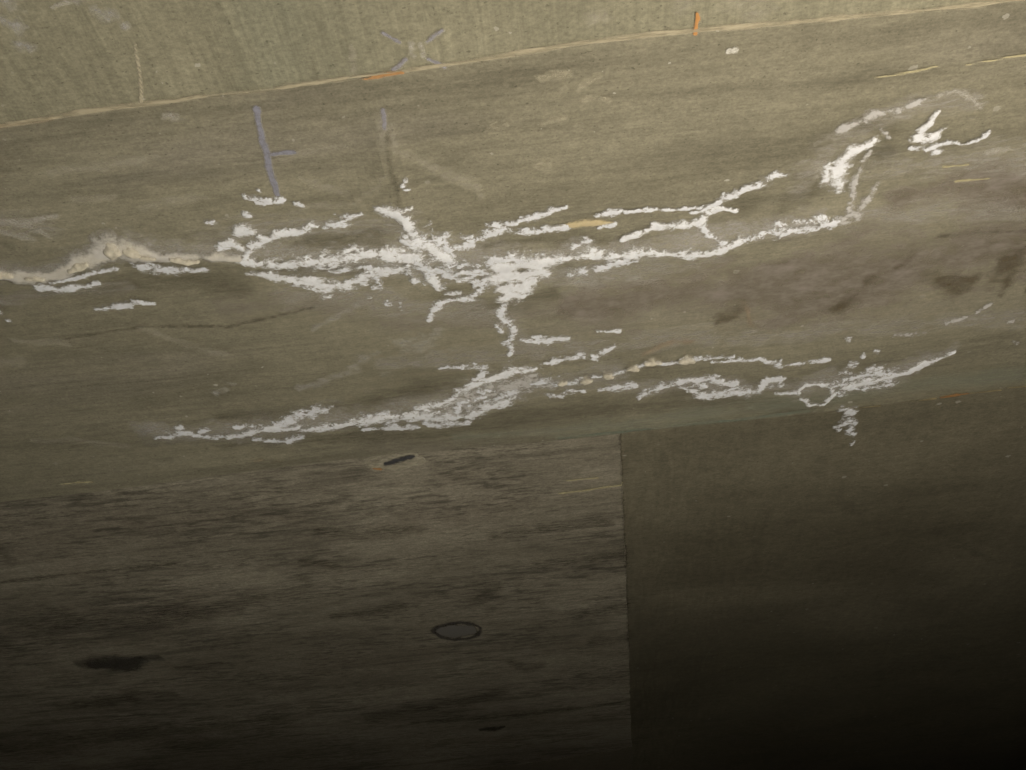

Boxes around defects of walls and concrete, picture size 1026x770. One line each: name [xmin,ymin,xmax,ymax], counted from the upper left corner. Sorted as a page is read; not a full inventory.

water stain [0,90,1026,446]